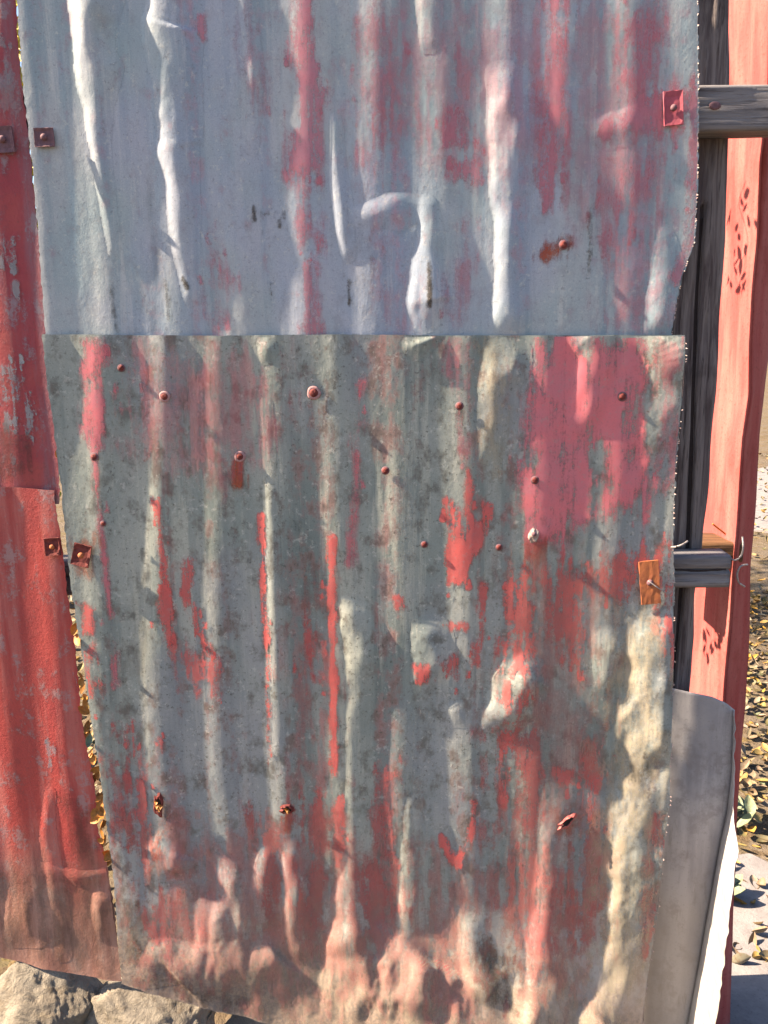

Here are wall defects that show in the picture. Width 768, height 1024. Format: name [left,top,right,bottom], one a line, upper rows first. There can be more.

corrosion [539,237,573,262]
corrosion [231,460,243,488]
peeling [413,336,674,1024]